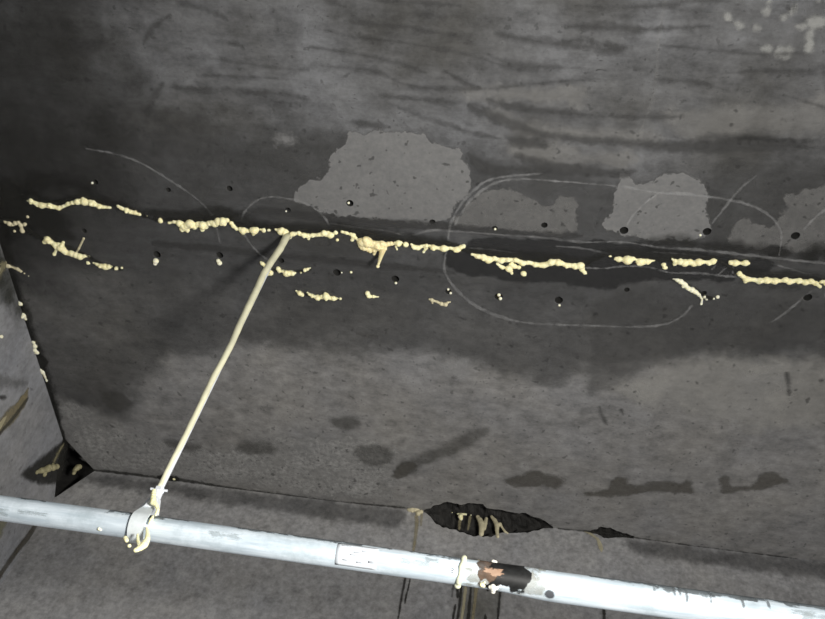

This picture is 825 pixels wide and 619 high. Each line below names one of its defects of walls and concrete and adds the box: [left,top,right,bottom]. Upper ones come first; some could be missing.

crack [21,194,825,300]
water stain [265,128,825,343]
water stain [142,241,306,321]
crack [0,212,123,448]
water stain [394,455,434,479]
water stain [506,471,562,488]
water stain [585,477,693,497]
water stain [720,472,788,493]
spalling [424,502,553,537]
water stain [397,578,411,619]
water stain [452,585,489,619]